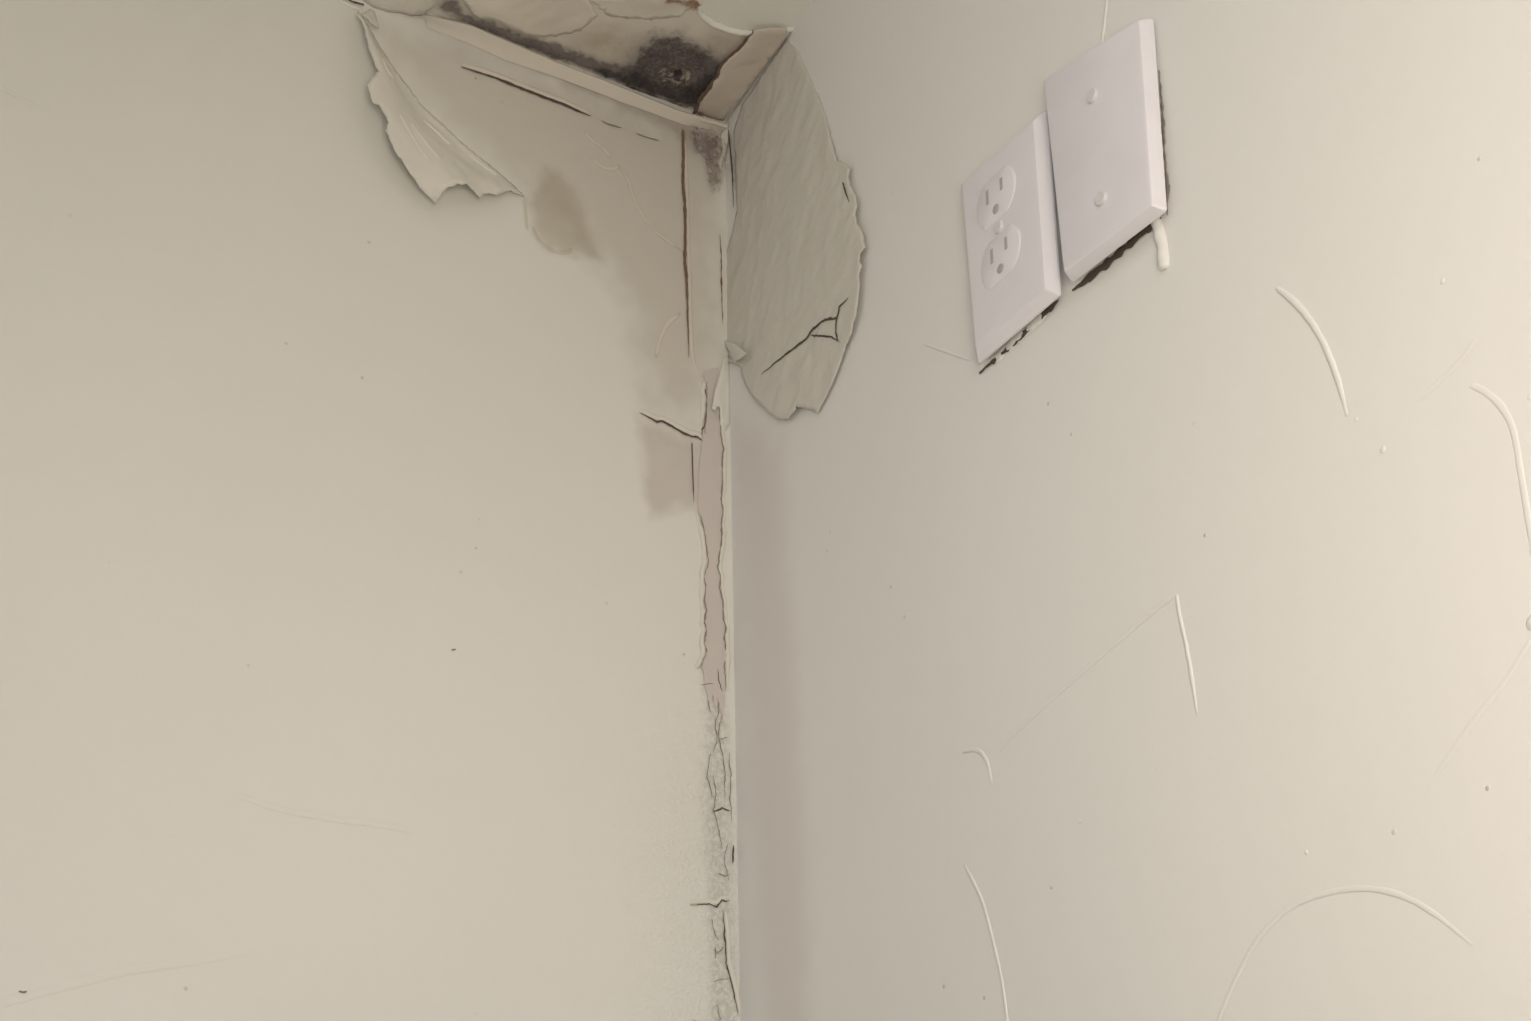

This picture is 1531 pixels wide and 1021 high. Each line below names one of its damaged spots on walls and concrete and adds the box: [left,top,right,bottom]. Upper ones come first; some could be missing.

peeling [357,0,525,204]
damp [440,1,719,107]
peeling [464,0,794,121]
peeling [695,355,731,723]
crack [689,669,741,1021]